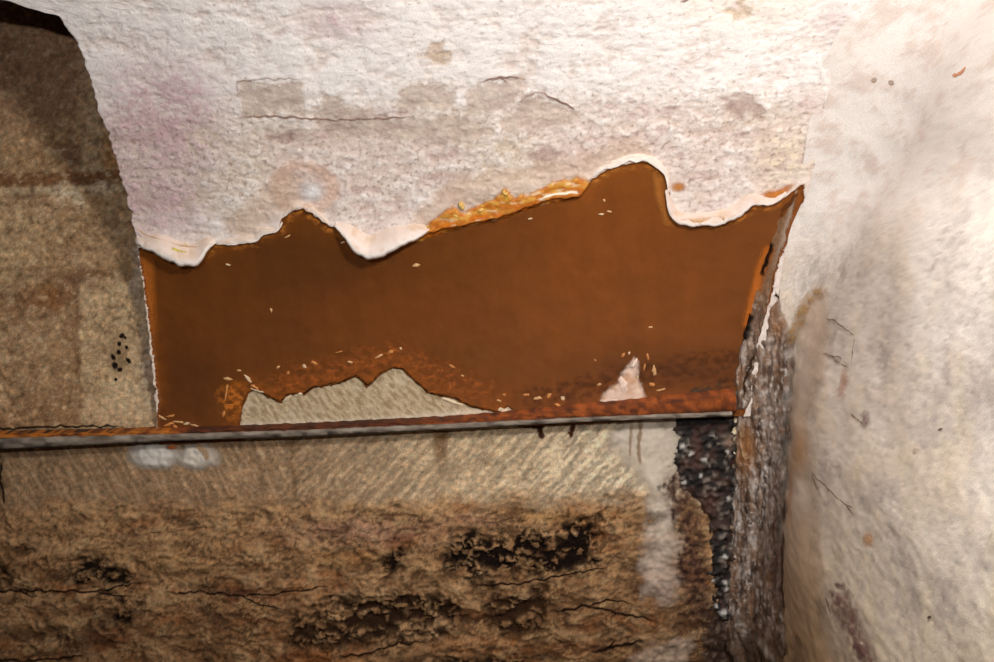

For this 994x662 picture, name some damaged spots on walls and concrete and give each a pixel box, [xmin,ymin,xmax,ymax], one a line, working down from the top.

peeling [589,153,787,227]
peeling [135,202,429,267]
corrosion [0,161,805,453]
spalling [240,366,511,425]
spalling [246,426,518,440]
water stain [611,190,873,662]
crack [0,583,132,598]
crack [172,586,323,609]
crack [480,568,602,587]
crack [558,599,652,653]